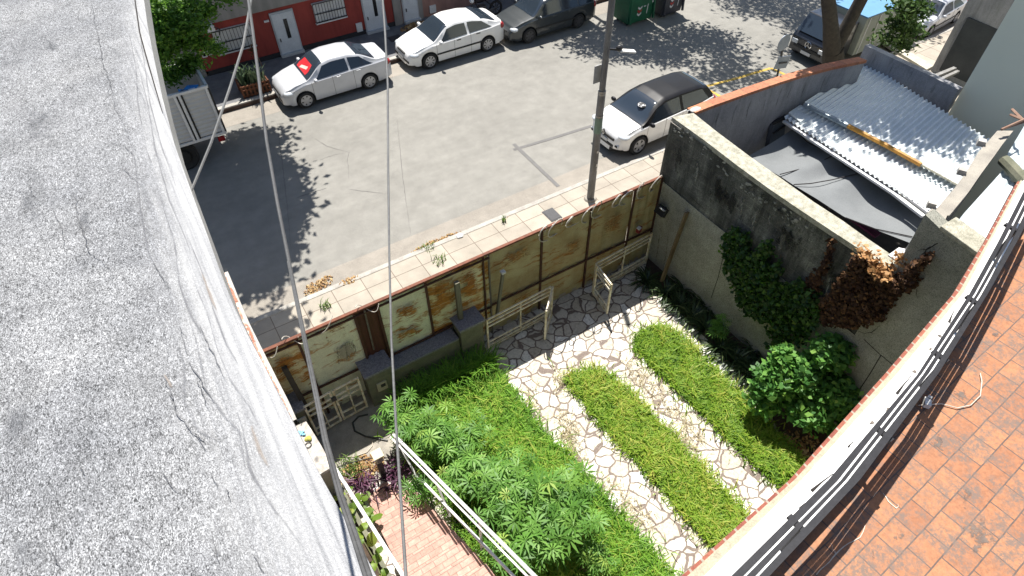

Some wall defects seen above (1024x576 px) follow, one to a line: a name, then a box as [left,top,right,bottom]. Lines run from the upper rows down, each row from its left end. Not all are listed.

crack [53,193,113,275]
corrosion [394,302,422,343]
crack [179,324,225,408]
crack [163,376,230,498]